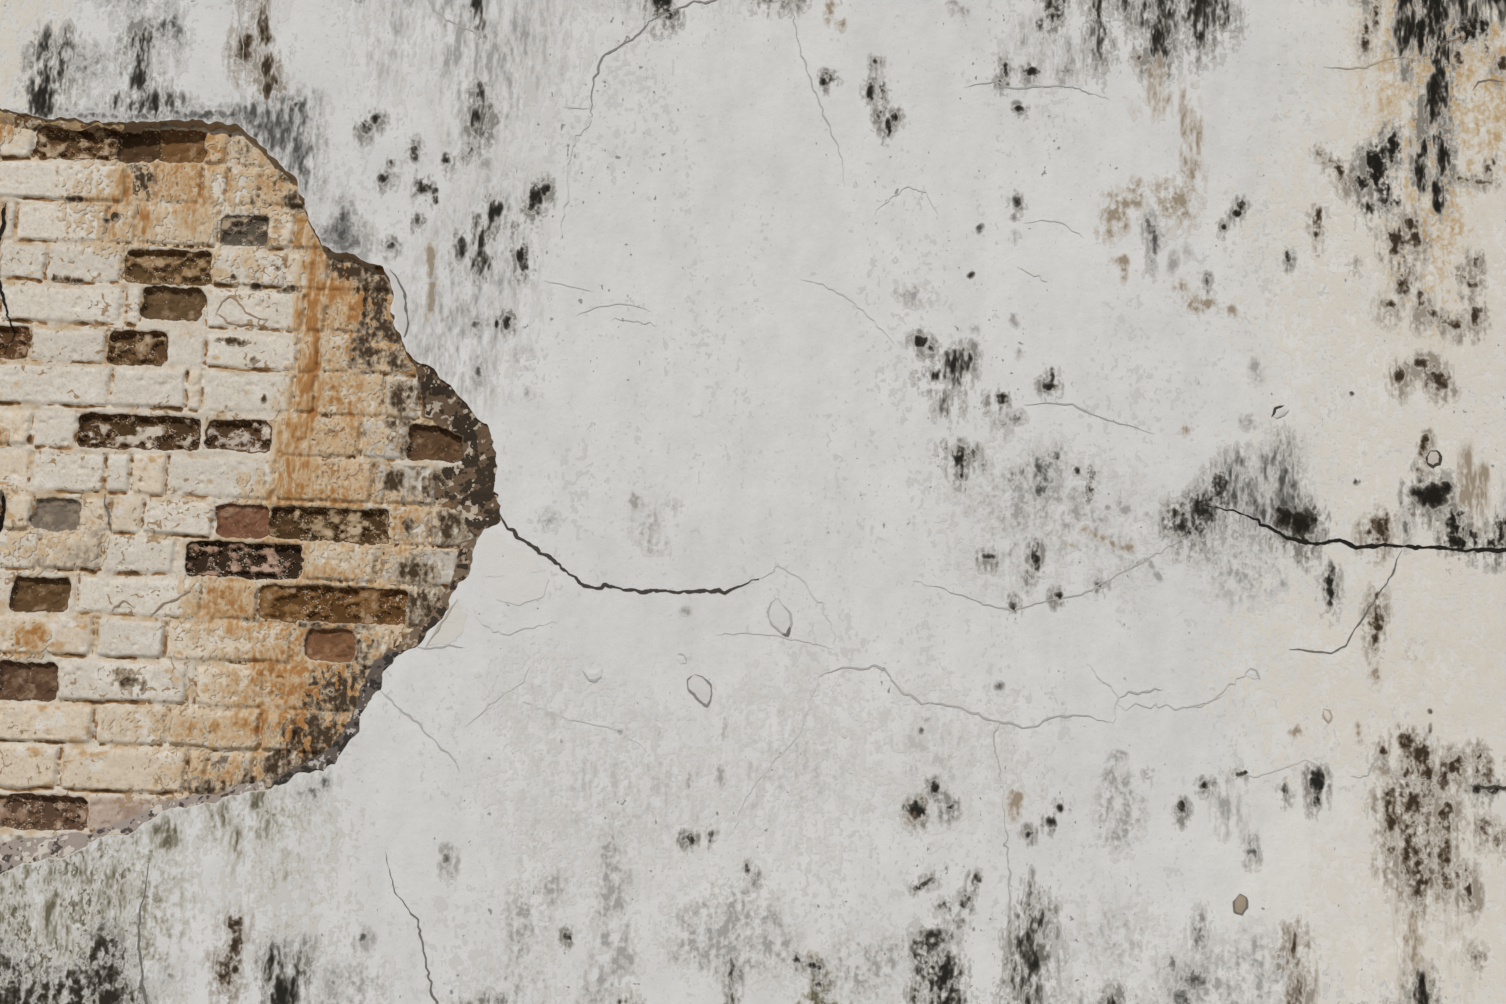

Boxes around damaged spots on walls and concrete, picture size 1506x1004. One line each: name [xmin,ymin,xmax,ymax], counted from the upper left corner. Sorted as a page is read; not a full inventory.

crack [0,203,8,241]
crack [0,281,15,355]
water stain [0,0,848,420]
crack [560,0,716,237]
crack [789,0,845,185]
crack [0,496,8,532]
spalling [0,108,546,874]
water stain [450,0,1506,1004]
crack [917,505,1506,654]
water stain [0,766,402,1004]
crack [499,513,1245,1004]
crack [1471,783,1506,791]